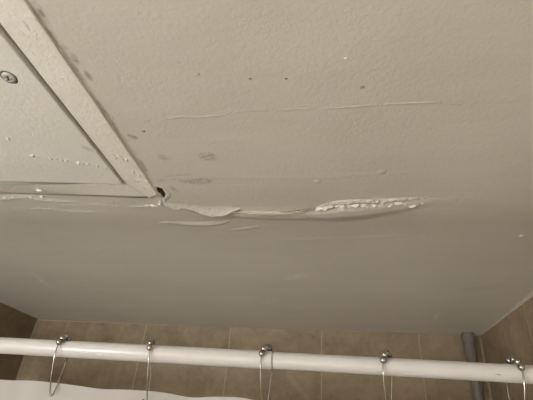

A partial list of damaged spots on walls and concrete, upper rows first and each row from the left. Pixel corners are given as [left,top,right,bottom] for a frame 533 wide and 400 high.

spalling [152,183,171,203]